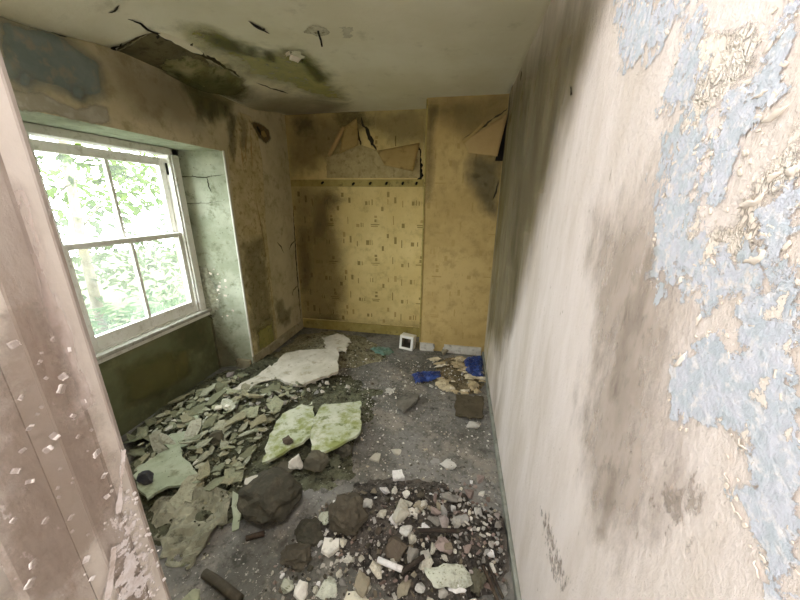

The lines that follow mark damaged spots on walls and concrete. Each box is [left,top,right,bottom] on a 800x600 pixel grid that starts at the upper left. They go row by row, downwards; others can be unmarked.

water stain [0,21,102,99]
crack [109,6,240,77]
water stain [173,71,244,118]
water stain [191,31,340,99]
crack [182,175,220,204]
water stain [471,11,589,340]
peeling [613,0,800,600]
peeling [43,372,69,394]
water stain [587,234,659,510]
peeling [42,432,61,454]
peeling [101,449,166,600]
peeling [23,557,37,590]